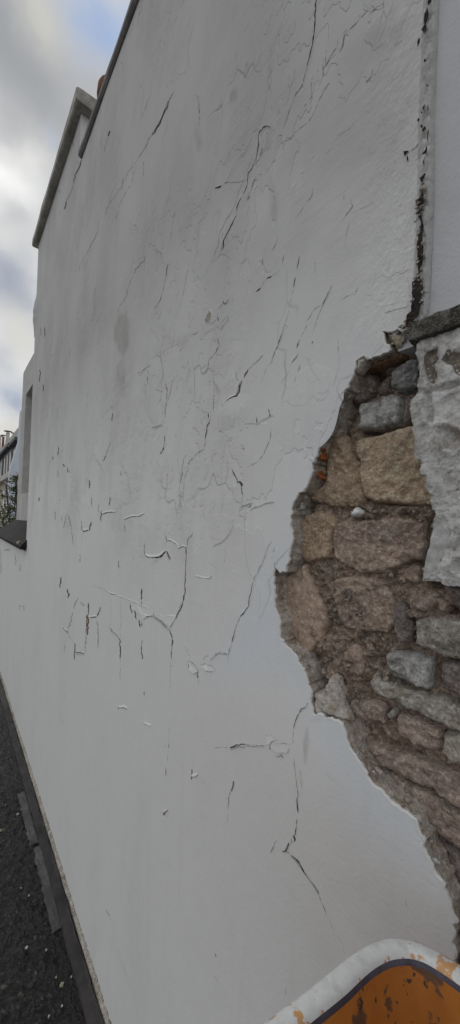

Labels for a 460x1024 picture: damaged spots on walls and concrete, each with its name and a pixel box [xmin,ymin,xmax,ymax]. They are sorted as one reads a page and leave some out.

crack [140,93,173,155]
crack [215,0,378,249]
crack [386,0,431,333]
crack [160,285,349,478]
crack [232,431,271,495]
corrosion [317,448,328,481]
crack [59,578,143,659]
crack [165,525,234,658]
crack [228,541,274,654]
spalling [272,327,460,964]
crack [293,703,309,729]
crack [271,764,326,912]